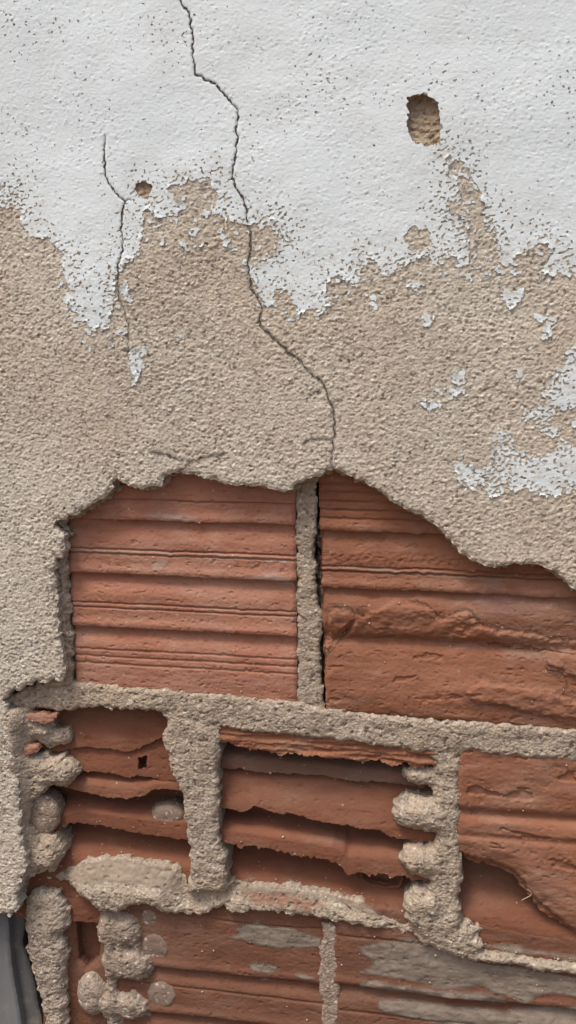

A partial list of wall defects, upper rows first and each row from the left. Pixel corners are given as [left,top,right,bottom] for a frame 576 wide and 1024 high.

crack [103,144,129,360]
crack [179,0,342,468]
peeling [0,95,576,386]
crack [150,452,225,473]
peeling [421,370,466,413]
peeling [453,343,576,498]
flaking render [57,469,576,592]
crack [316,523,363,669]
spalling [325,598,576,679]
spalling [465,679,576,721]
spalling [463,853,576,932]